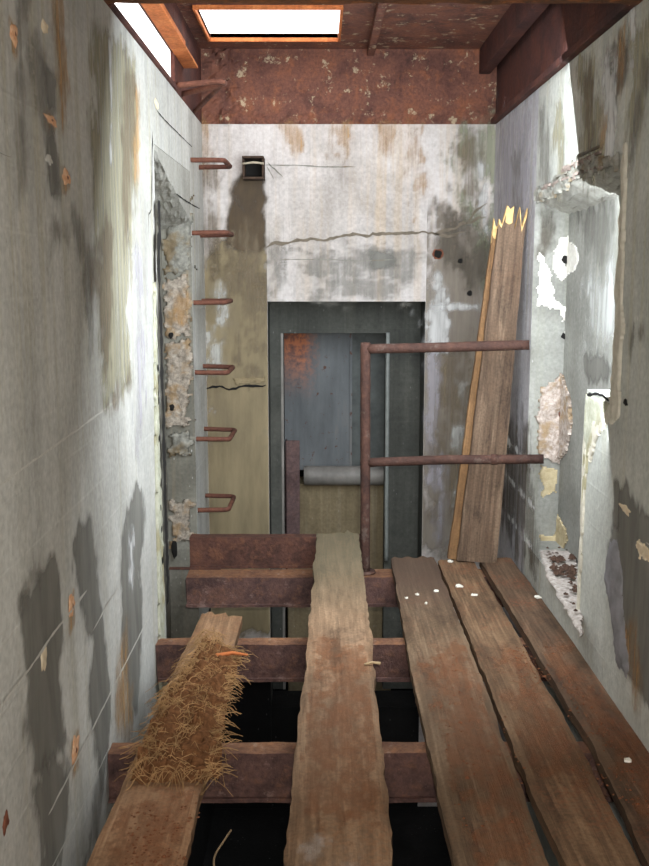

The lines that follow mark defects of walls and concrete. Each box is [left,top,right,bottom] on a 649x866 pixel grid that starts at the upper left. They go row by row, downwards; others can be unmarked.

damp [48,127,59,195]
damp [91,217,113,373]
damp [121,71,139,241]
damp [204,174,269,534]
crack [207,377,266,390]
crack [265,203,487,261]
flaking render [533,143,628,610]
damp [19,555,69,866]
damp [73,516,111,839]
damp [121,482,144,717]
damp [211,607,270,637]
damp [611,481,649,706]